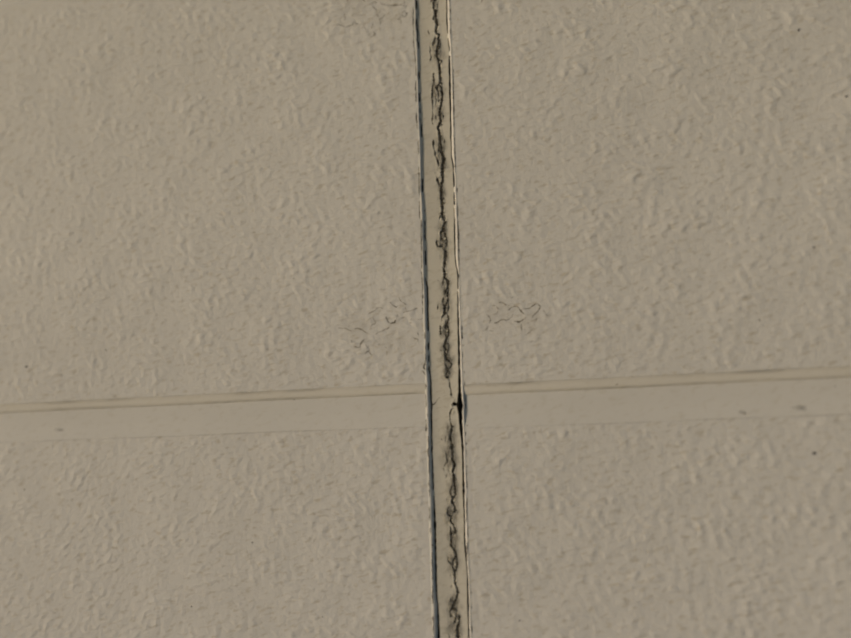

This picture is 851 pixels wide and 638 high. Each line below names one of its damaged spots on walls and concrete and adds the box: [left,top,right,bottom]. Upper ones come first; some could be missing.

crack [336,0,472,638]
crack [483,293,546,342]